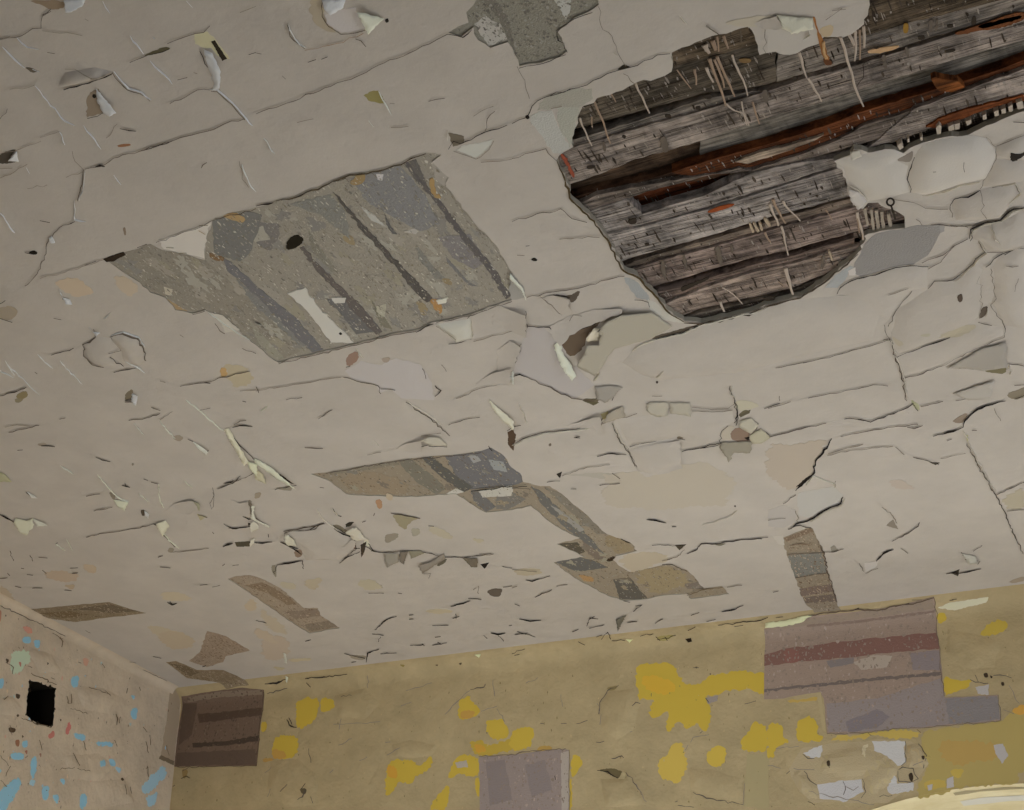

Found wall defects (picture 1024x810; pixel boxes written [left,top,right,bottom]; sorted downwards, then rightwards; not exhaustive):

spalling [450,0,598,65]
peeling [754,15,828,59]
crack [0,2,472,320]
spalling [529,88,593,153]
spalling [174,153,775,425]
crack [1,329,146,396]
crack [137,6,1024,692]
crack [7,418,64,451]
spalling [314,437,727,600]
spalling [142,688,335,807]
peeling [430,696,552,810]
spalling [635,597,1024,806]